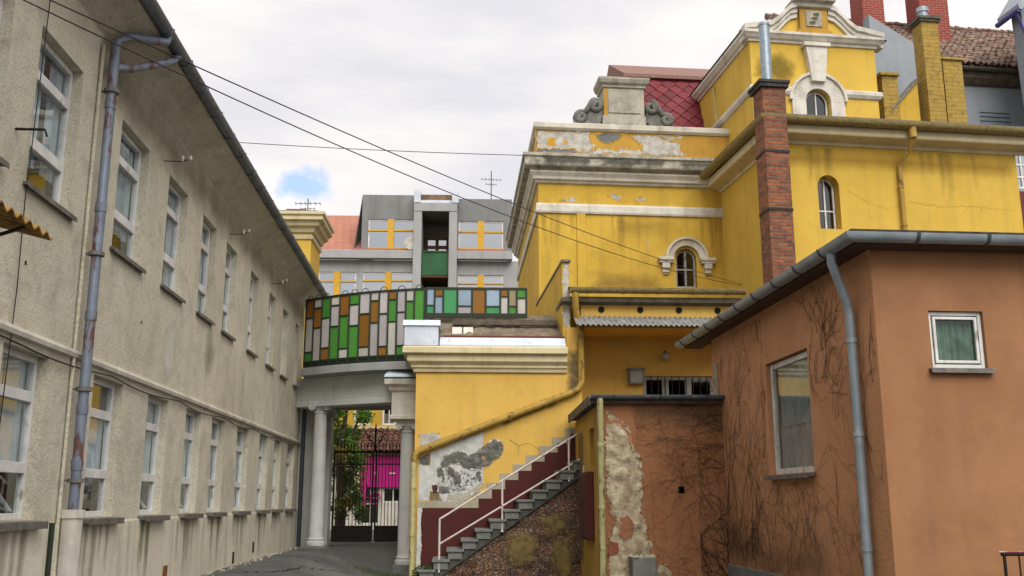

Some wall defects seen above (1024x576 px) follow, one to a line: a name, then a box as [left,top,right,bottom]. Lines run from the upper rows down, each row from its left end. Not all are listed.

peeling [534,129,686,157]
flaking render [416,428,575,571]
flaking render [604,410,673,576]